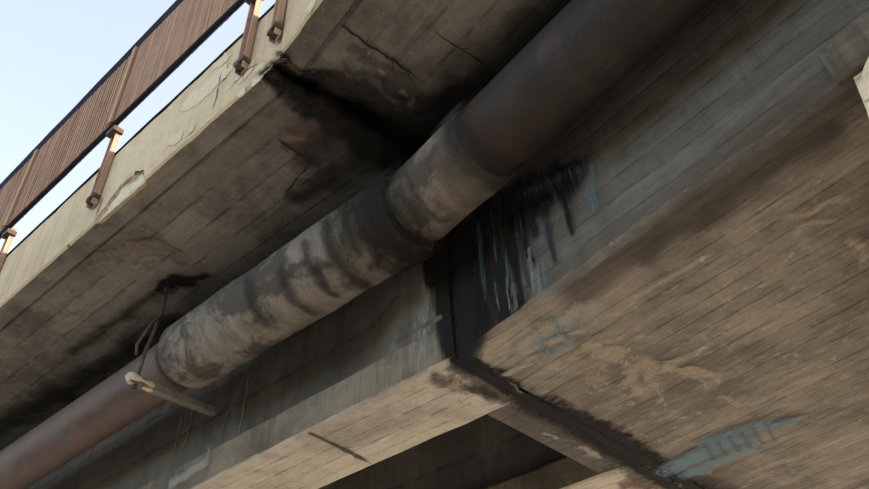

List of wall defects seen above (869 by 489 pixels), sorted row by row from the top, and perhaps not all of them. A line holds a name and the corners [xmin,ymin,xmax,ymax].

crack [340,25,418,79]
leakage [257,0,571,203]
spalling [98,170,146,223]
leakage [413,156,721,489]
crack [308,433,371,464]